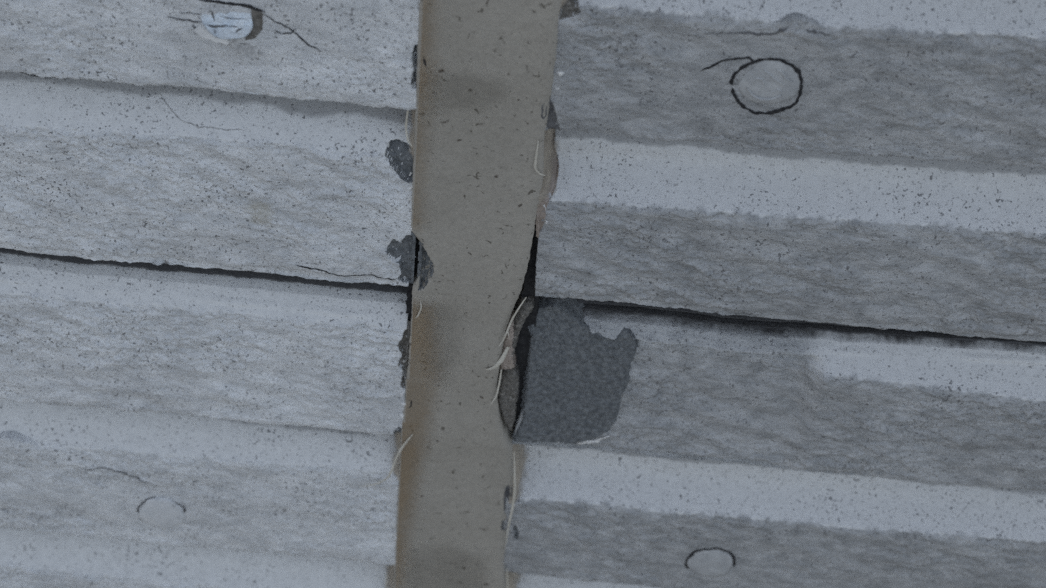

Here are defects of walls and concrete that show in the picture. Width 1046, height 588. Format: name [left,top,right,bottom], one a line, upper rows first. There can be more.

peeling [192,0,265,58]
spalling [385,139,416,284]
spalling [511,296,639,444]